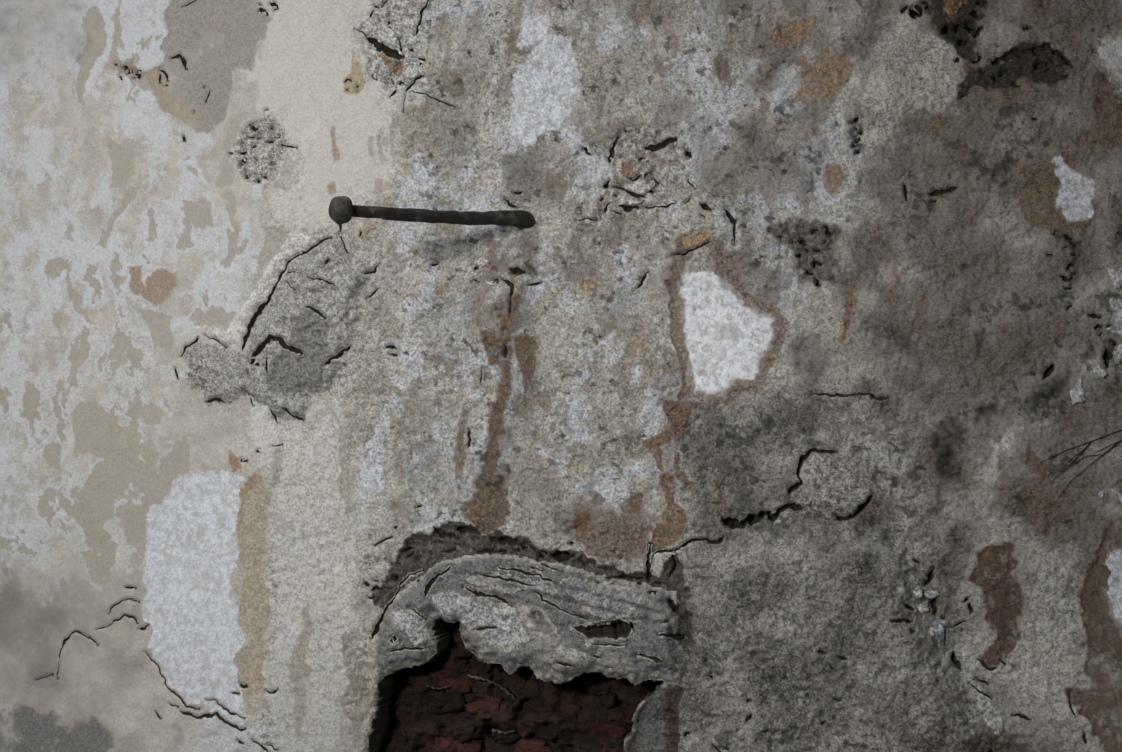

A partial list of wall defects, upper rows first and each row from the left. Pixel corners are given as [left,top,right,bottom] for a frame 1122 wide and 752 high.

flaking render [109,0,297,192]
water stain [899,0,1080,110]
corrosion [354,217,376,244]
flaking render [570,118,791,412]
corrosion [451,278,542,535]
water stain [0,693,133,752]
crack [35,585,278,752]
flaking render [140,442,282,720]
spalling [363,504,697,656]
crack [653,446,837,556]
crack [835,495,874,523]
water stain [1061,490,1122,752]